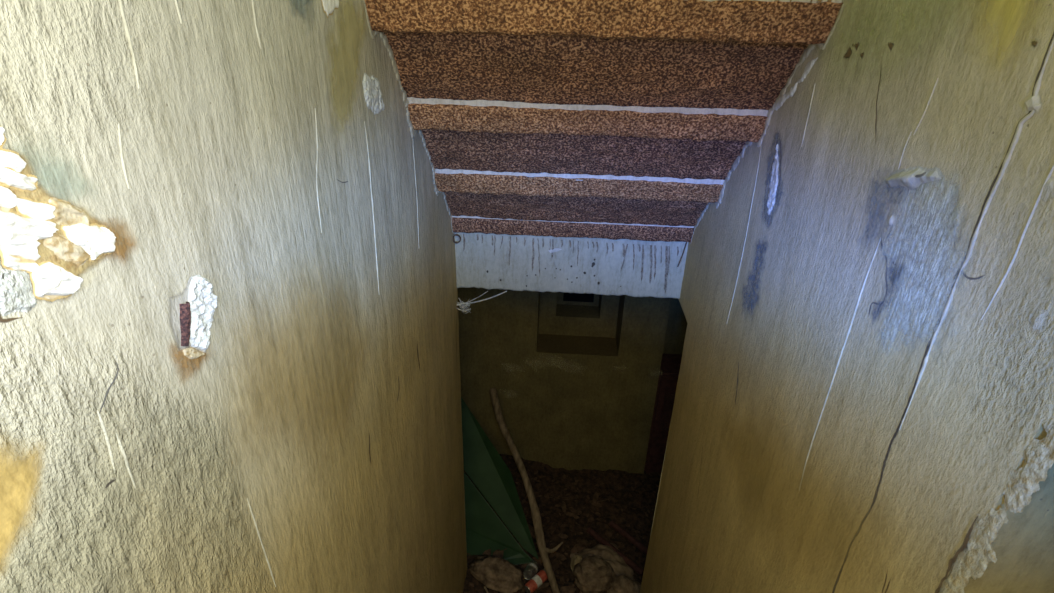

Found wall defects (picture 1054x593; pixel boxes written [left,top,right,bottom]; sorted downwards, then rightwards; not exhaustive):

flaking render [0,126,116,317]
spalling [170,275,217,374]
crack [832,33,1054,593]
leakage [0,454,37,562]
flaking render [935,420,1054,593]